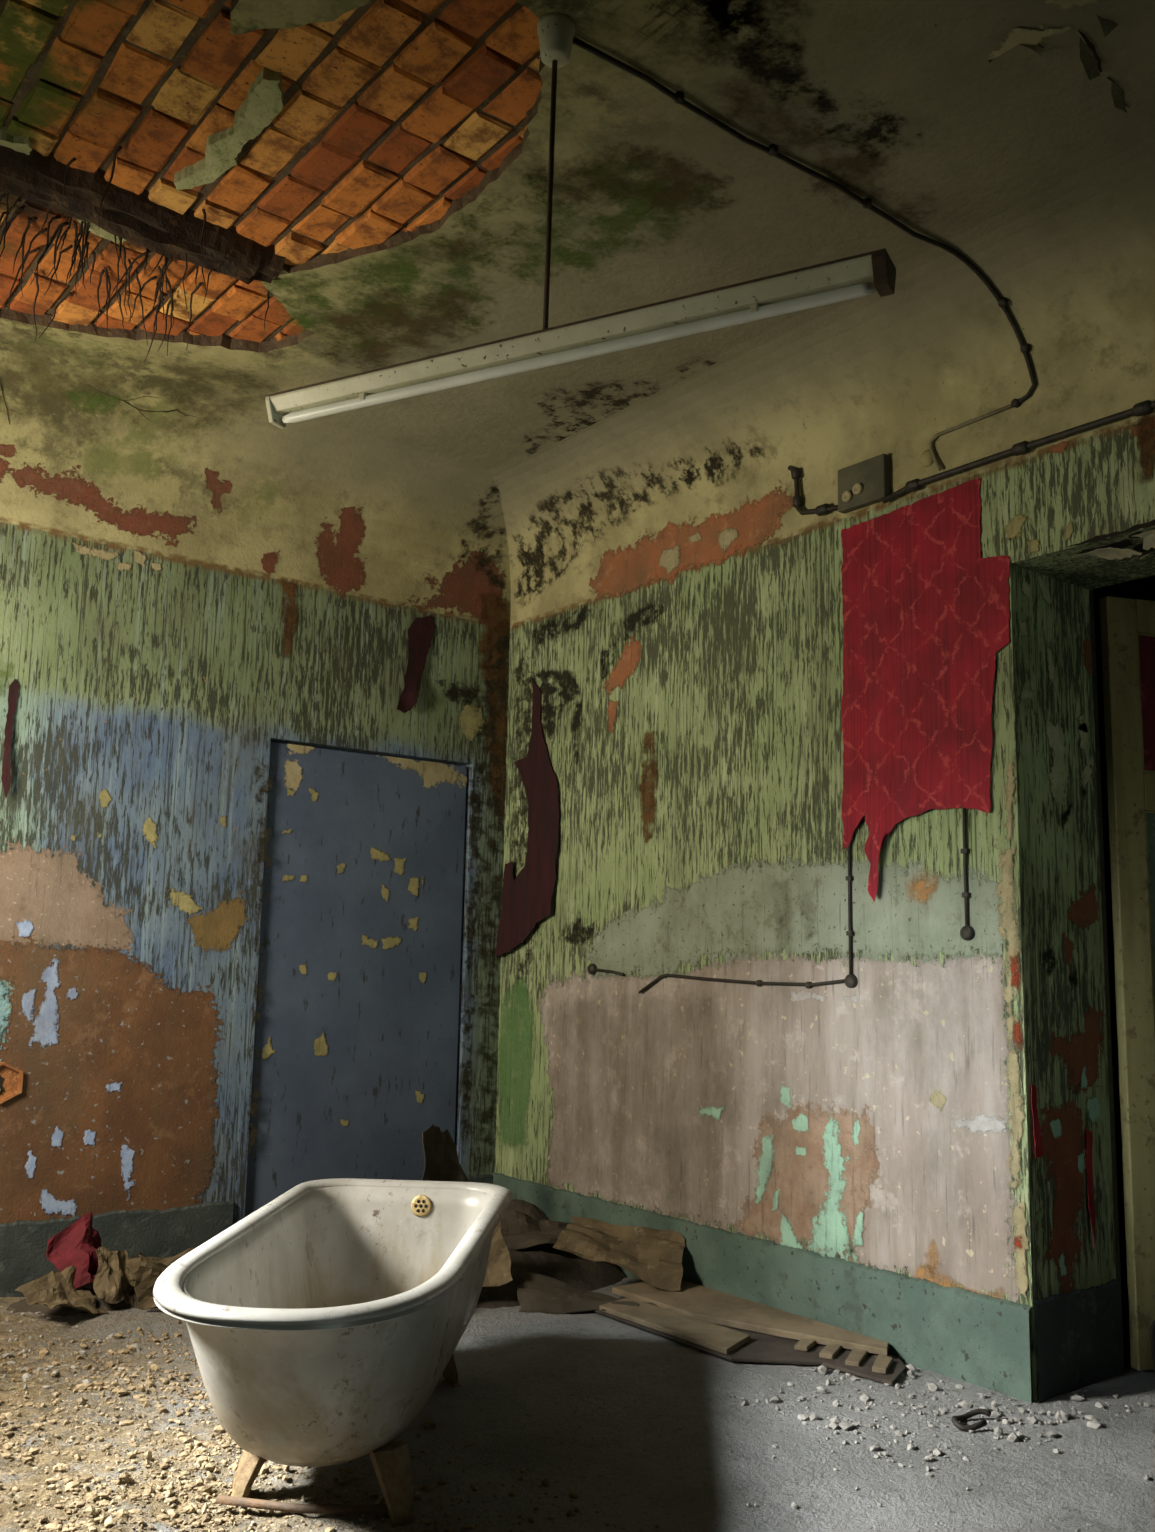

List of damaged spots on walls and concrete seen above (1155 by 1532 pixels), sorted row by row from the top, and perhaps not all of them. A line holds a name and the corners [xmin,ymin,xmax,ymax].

flaking render [0,0,542,266]
leakage [648,0,904,199]
peeling [988,0,1127,113]
flaking render [0,190,305,342]
spalling [0,443,197,571]
spalling [204,468,232,515]
spalling [261,550,280,575]
peeling [1058,519,1155,560]
peeling [141,817,159,849]
leakage [438,443,763,1168]
peeling [0,835,227,1224]
flaking render [536,758,1030,1302]